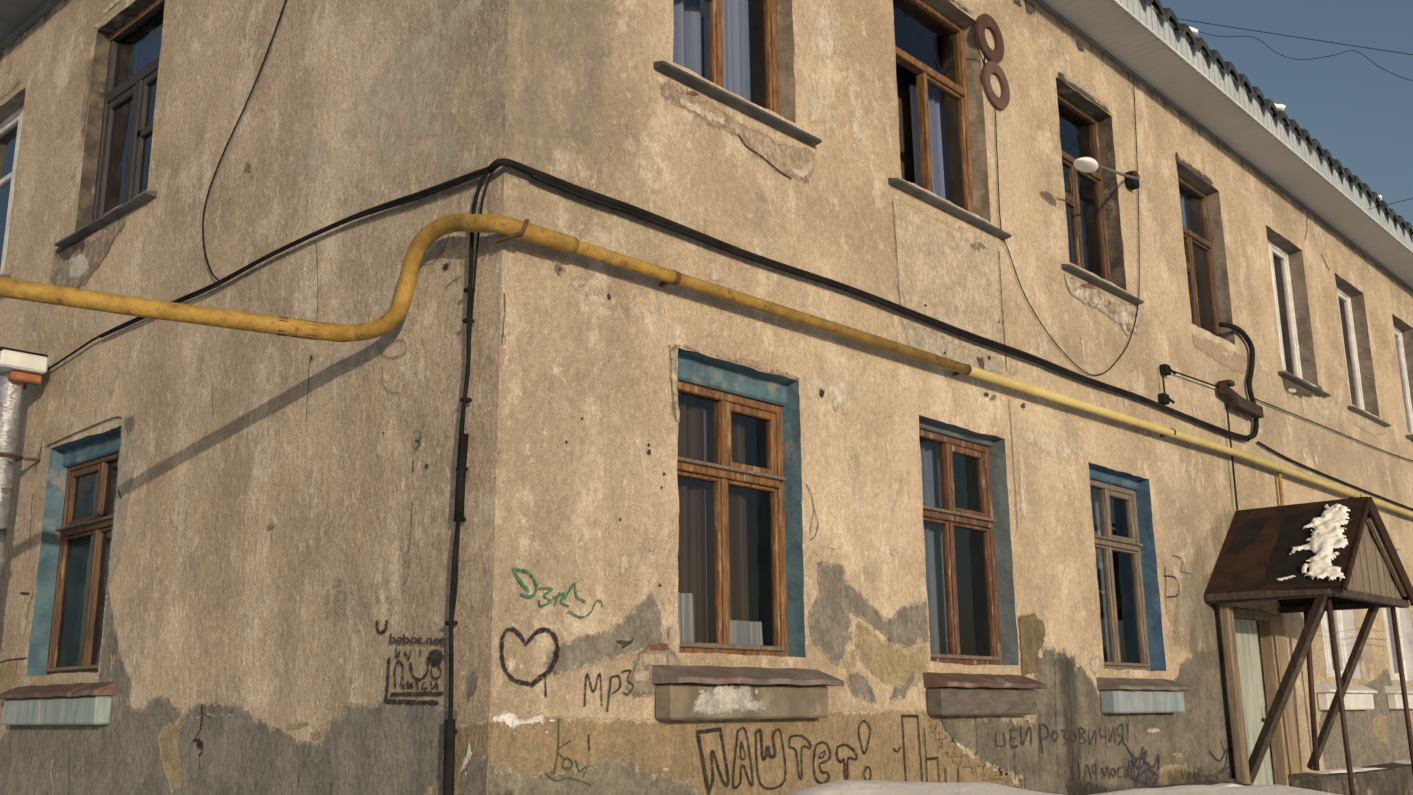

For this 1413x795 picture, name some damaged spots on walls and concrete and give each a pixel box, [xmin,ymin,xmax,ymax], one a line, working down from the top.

spalling [661,79,816,183]
spalling [50,215,125,288]
spalling [1065,273,1141,336]
peeling [0,415,702,795]
peeling [808,545,930,704]
peeling [941,613,1235,795]